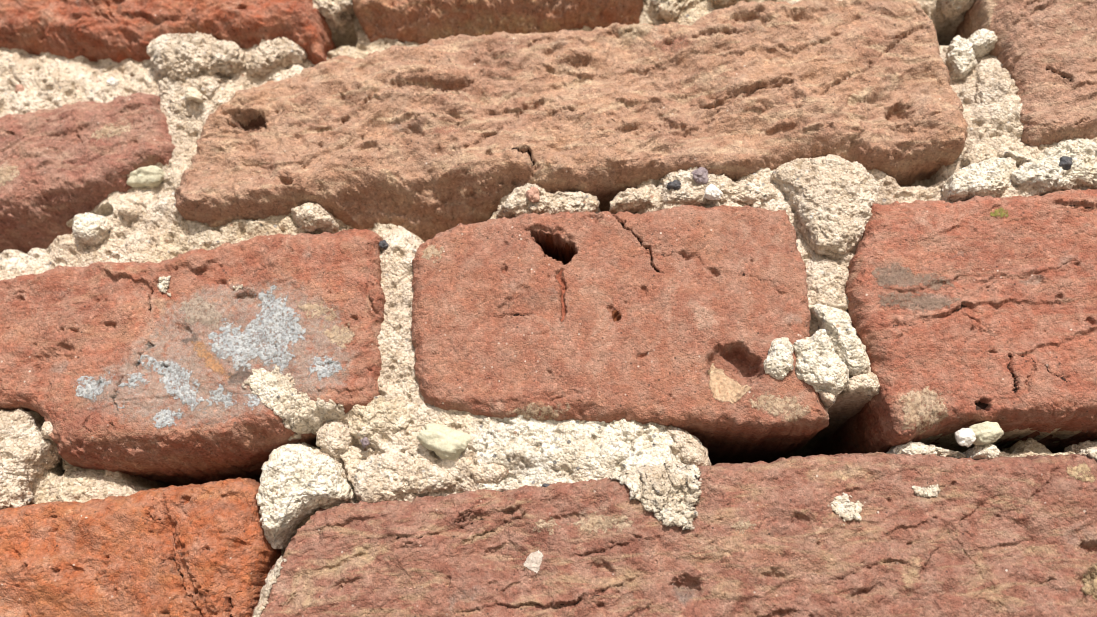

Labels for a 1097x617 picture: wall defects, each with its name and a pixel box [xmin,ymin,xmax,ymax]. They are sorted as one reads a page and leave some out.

crack [611,213,665,272]
damp [73,285,355,429]
spalling [708,363,752,404]